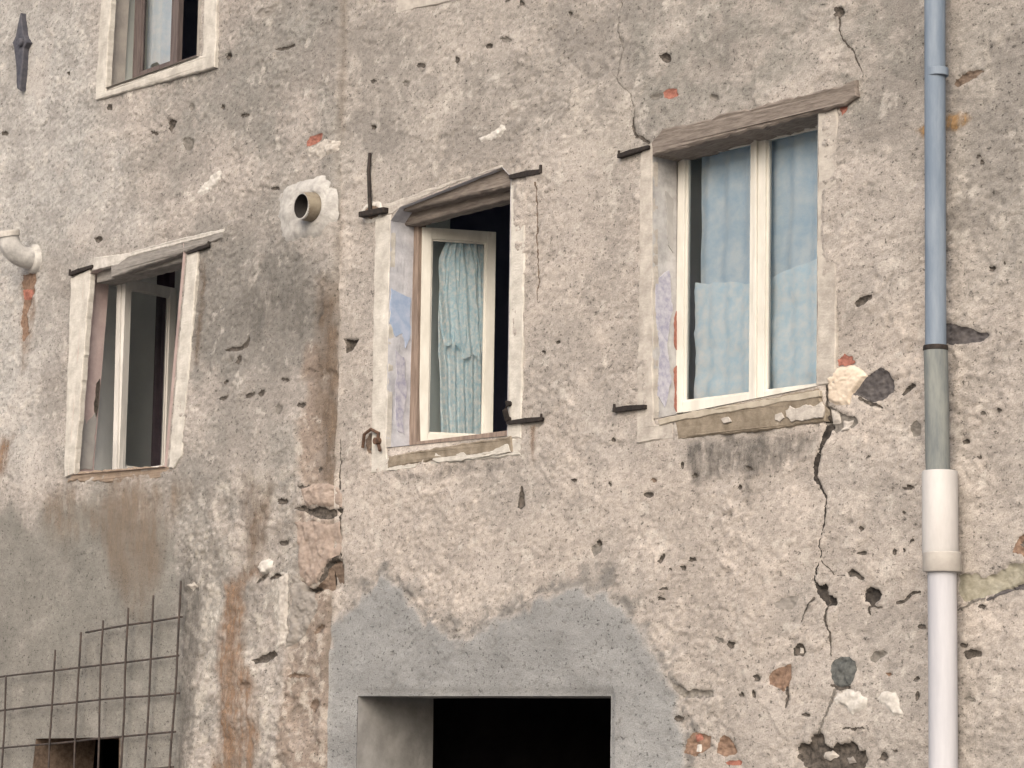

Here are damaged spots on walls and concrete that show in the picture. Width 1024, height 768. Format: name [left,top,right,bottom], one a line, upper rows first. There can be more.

crack [616,1,650,144]
crack [833,7,864,77]
flaking render [853,367,916,409]
spalling [251,467,345,664]
crack [801,421,845,656]
flaking render [959,534,1024,609]
corrosion [213,567,258,768]
flaking render [739,643,806,708]
flaking render [830,657,857,690]
spalling [960,643,982,659]
crack [817,688,836,736]
spalling [797,726,898,768]